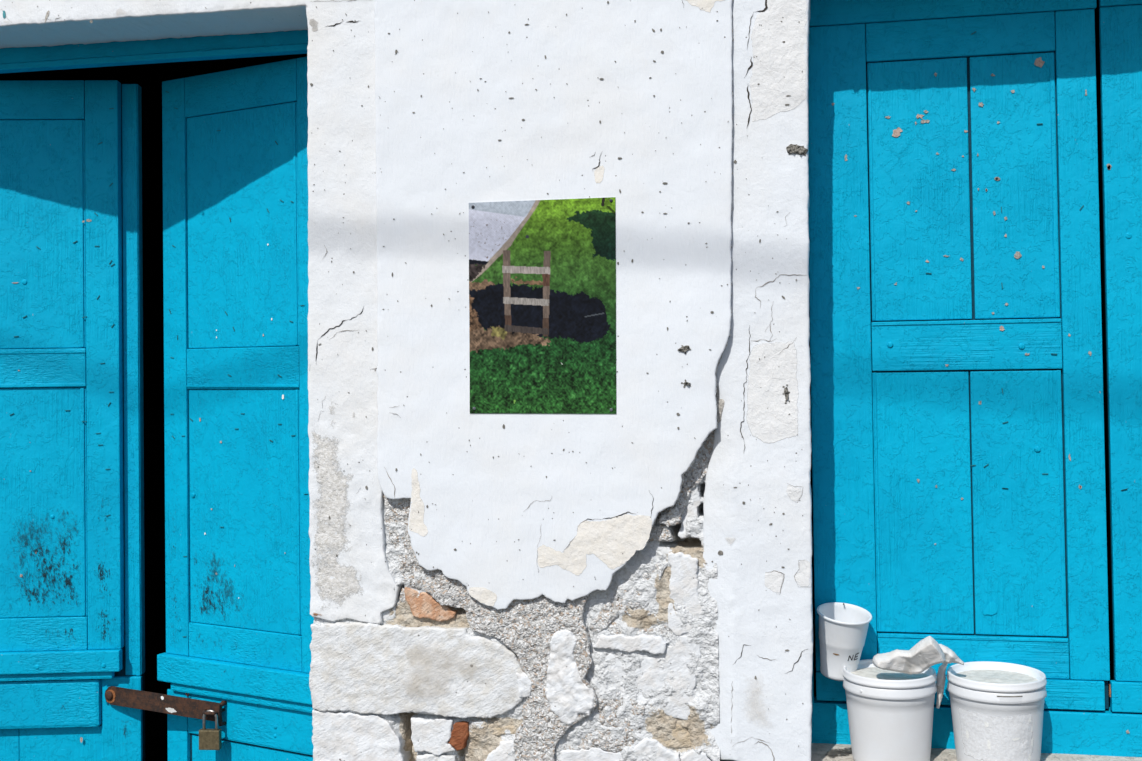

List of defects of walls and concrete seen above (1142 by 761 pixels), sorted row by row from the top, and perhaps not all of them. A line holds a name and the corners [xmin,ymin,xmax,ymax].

crack [682,0,723,12]
crack [744,0,807,126]
crack [309,309,363,371]
crack [740,274,800,450]
flaking render [309,386,725,761]